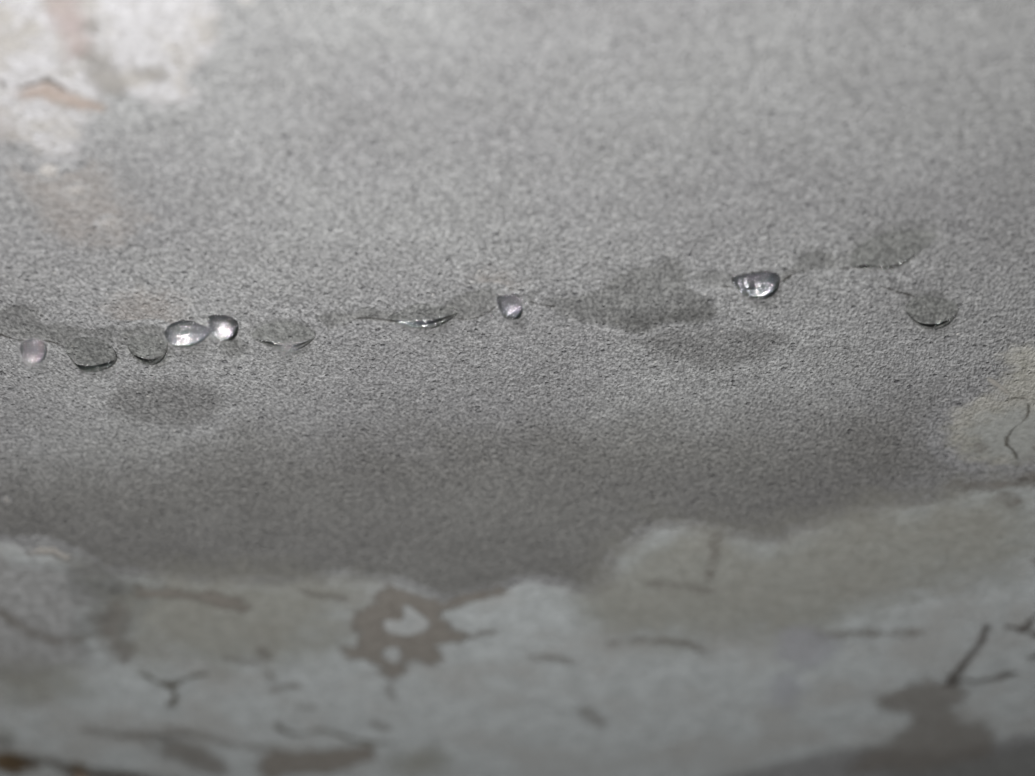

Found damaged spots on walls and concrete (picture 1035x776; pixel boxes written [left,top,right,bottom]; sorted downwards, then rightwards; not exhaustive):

water stain [0,136,1035,679]
peeling [136,587,252,612]
peeling [340,585,505,679]
crack [944,615,1035,686]
crack [142,673,207,707]
peeling [255,744,375,776]
peeling [852,682,993,772]